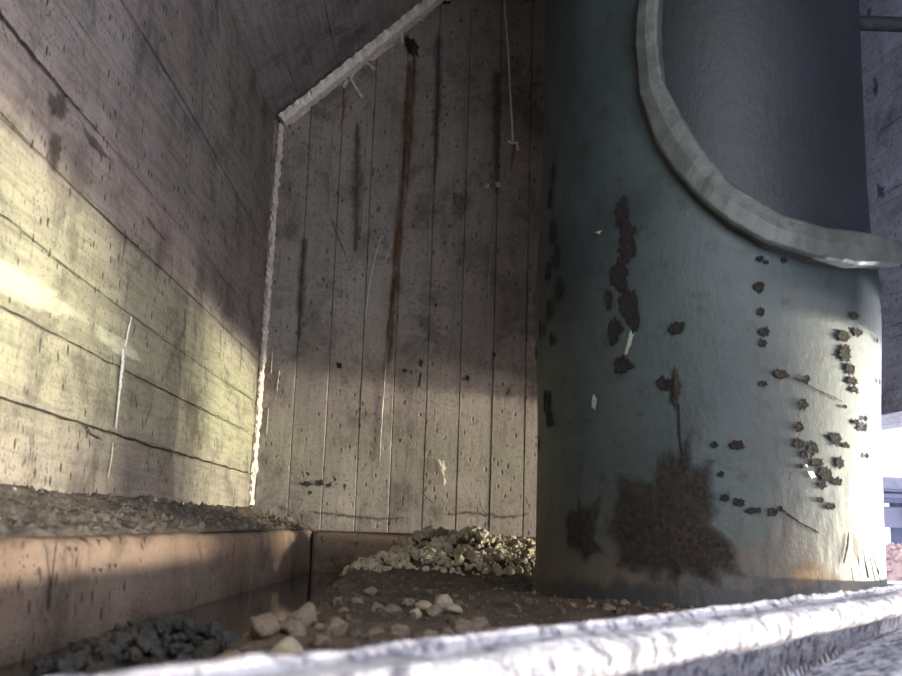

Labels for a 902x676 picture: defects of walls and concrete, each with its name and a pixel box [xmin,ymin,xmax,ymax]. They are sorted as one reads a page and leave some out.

peeling [605,195,640,373]
peeling [667,321,685,334]
peeling [758,326,770,347]
peeling [837,311,863,394]
peeling [656,375,672,390]
peeling [759,368,790,387]
peeling [852,416,868,432]
peeling [711,440,745,449]
peeling [793,398,850,510]
peeling [720,494,784,517]